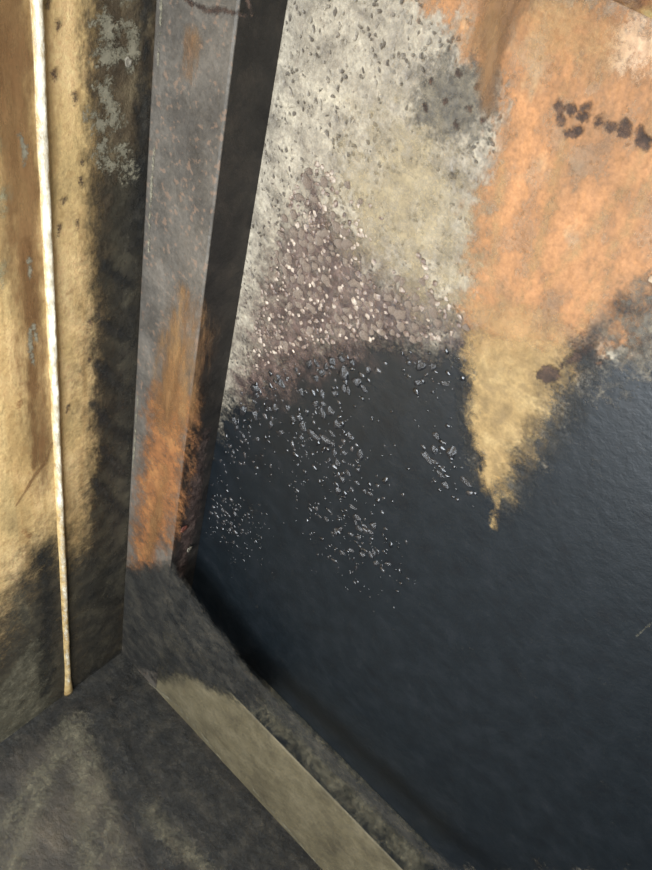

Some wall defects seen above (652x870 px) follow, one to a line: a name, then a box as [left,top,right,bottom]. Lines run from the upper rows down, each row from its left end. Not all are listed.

damp [310,180,332,245]
damp [348,126,467,296]
corrosion [413,0,652,374]
corrosion [129,287,194,570]